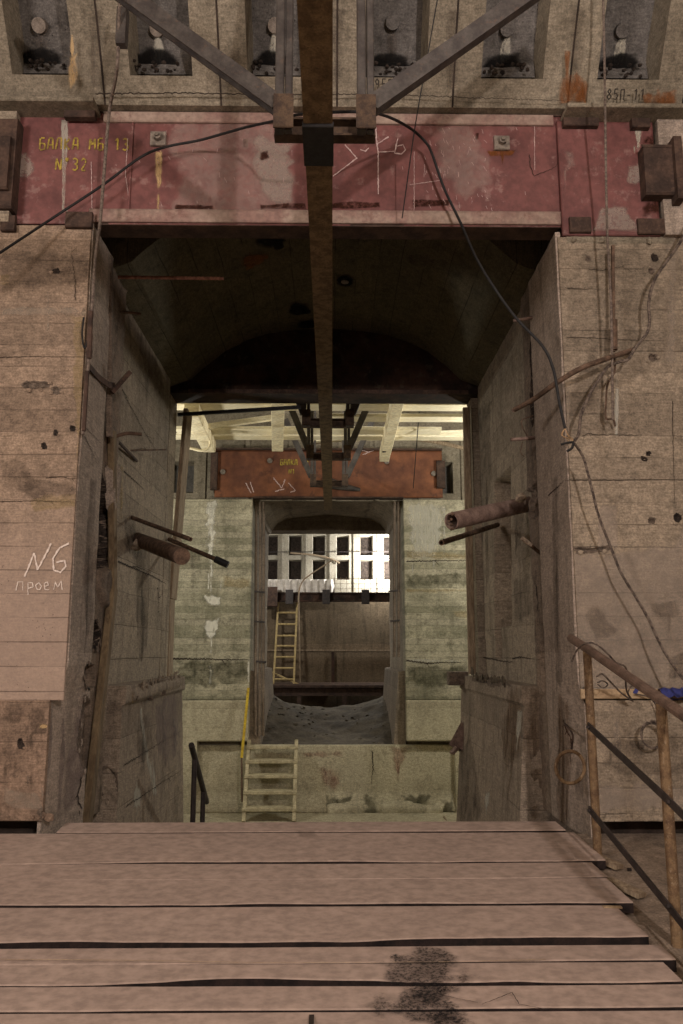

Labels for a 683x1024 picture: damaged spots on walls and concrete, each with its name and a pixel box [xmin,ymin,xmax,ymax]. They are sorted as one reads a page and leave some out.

rust [560,51,587,103]
spalling [96,473,109,568]
leakage [204,500,220,605]
leakage [205,619,218,647]